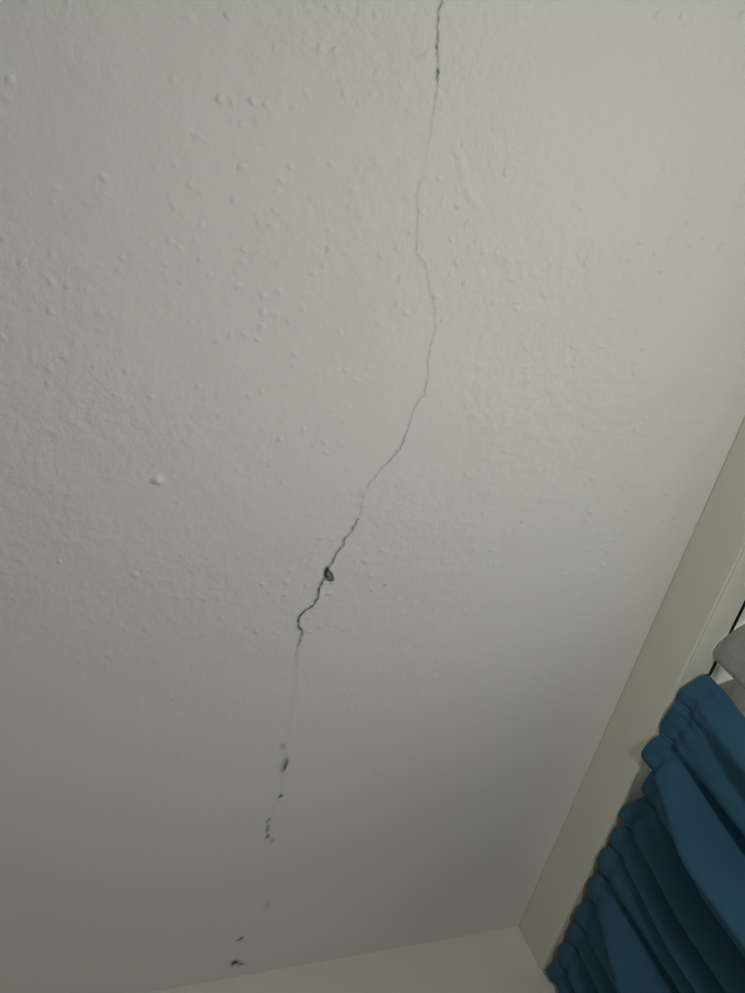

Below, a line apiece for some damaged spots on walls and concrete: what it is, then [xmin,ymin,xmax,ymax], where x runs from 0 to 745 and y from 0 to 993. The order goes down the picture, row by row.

crack [298,538,349,631]